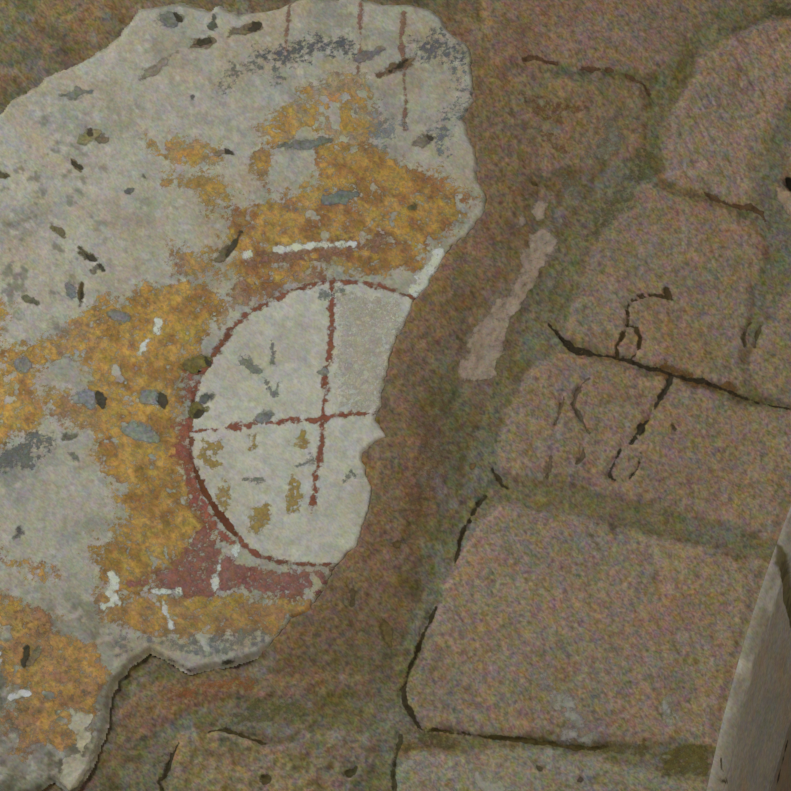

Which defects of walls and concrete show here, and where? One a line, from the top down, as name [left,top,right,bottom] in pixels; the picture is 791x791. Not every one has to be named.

spalling [225,230,242,257]
crack [548,287,789,481]
spalling [95,390,107,409]
spalling [157,392,168,409]
crack [545,455,553,478]
spalling [20,645,29,668]
flaking render [8,689,32,701]
flaking render [59,707,99,790]